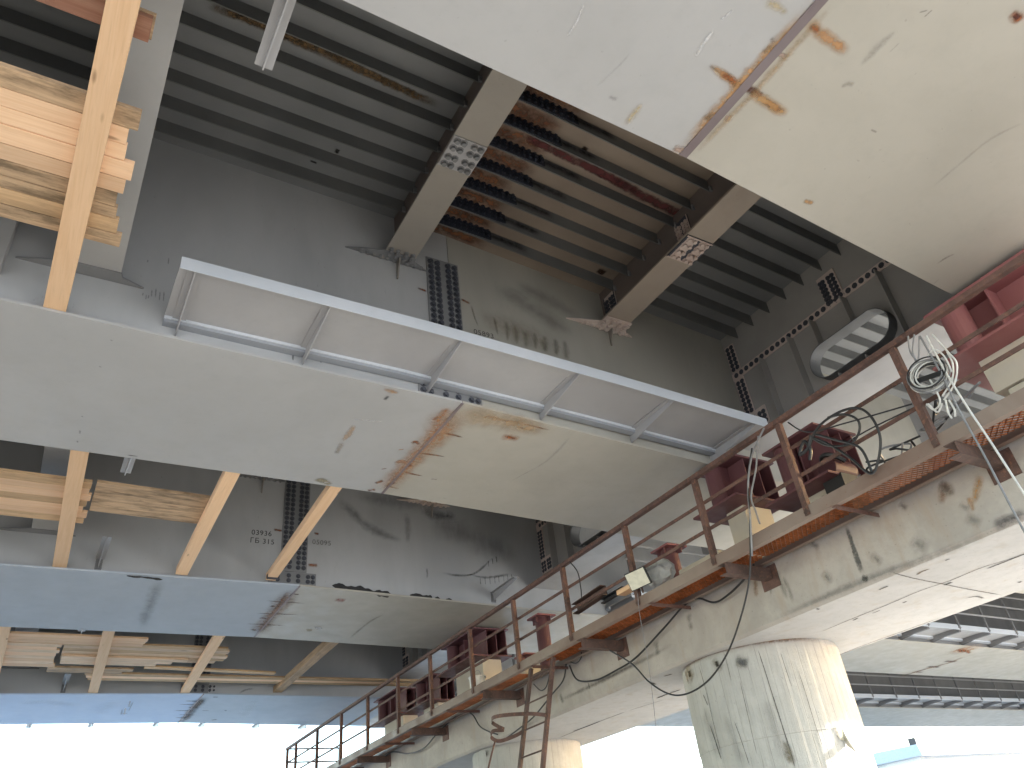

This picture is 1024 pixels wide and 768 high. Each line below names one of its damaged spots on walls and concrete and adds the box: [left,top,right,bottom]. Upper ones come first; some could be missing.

rust [811,25,844,51]
rust [700,29,798,130]
rust [496,103,556,150]
rust [525,85,610,136]
rust [434,147,562,249]
rust [368,410,460,491]
rust [252,594,298,630]